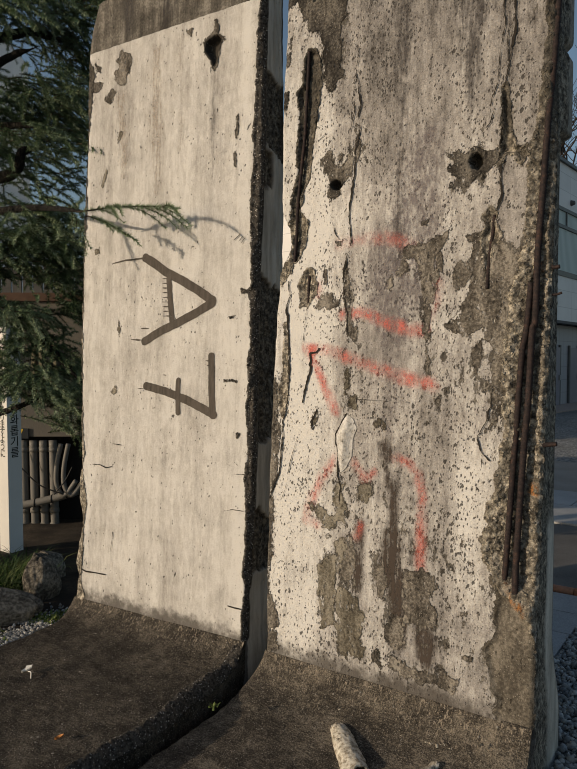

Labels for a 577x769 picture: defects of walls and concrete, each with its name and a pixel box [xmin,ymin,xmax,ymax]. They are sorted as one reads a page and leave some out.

spalling [280,0,362,342]
crack [332,47,362,374]
crack [486,0,517,211]
spalling [62,0,268,769]
crack [269,281,320,498]
peeling [308,482,347,531]
crack [335,399,366,499]
damp [353,521,363,595]
peeling [316,534,459,695]
damp [379,440,422,653]
damp [416,620,435,669]
spalling [385,0,562,730]